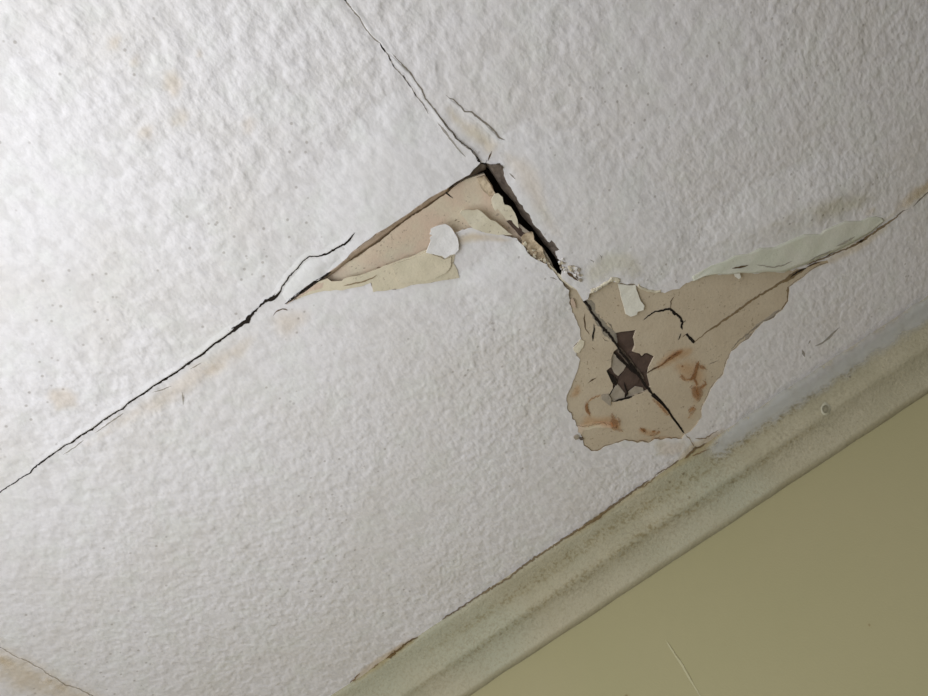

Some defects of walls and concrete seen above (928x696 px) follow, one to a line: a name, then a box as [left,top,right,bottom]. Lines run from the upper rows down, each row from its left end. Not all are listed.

crack [344,0,504,162]
crack [0,231,355,493]
peeling [287,163,884,451]
crack [442,192,928,620]
crack [0,642,93,696]
crack [350,637,418,683]